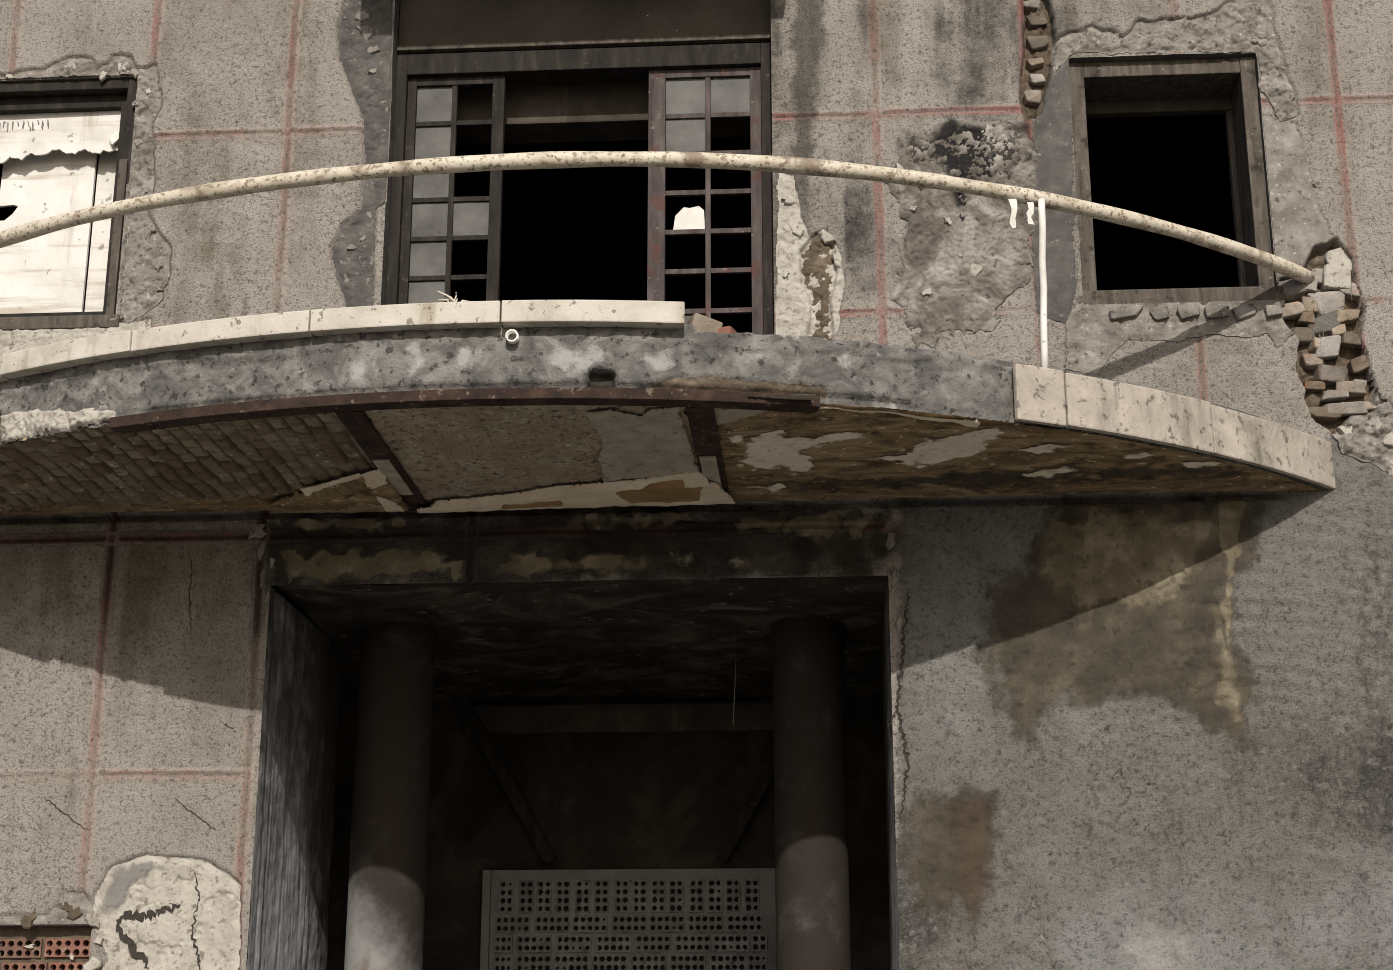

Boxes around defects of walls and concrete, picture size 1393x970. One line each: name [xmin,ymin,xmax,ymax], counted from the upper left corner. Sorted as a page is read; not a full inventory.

flaking render [0,55,171,356]
flaking render [332,0,392,307]
flaking render [0,405,877,610]
flaking render [775,173,844,341]
flaking render [650,376,1005,493]
crack [888,592,910,824]
leakage [774,464,1265,739]
flaking render [1018,444,1077,478]
flaking render [877,0,1297,347]
spalling [1065,246,1393,478]
spalling [0,855,241,970]
leakage [900,789,997,913]